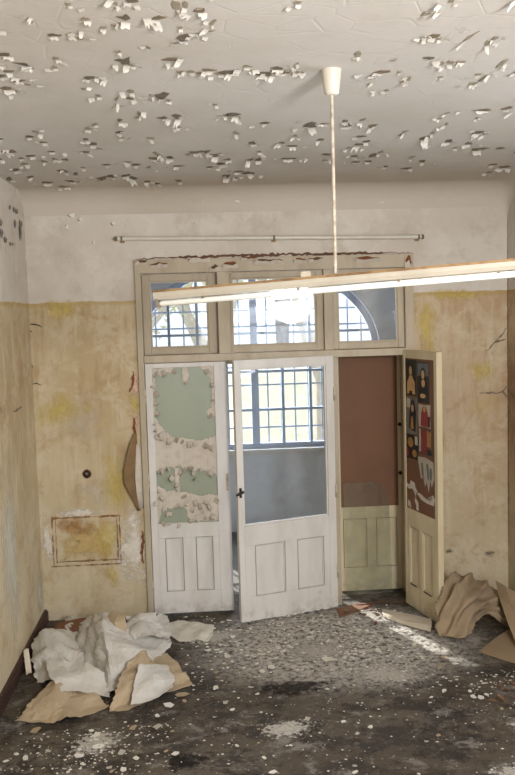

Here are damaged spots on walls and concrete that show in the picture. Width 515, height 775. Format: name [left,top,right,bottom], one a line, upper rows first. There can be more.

peeling [48,0,141,41]
peeling [143,15,167,32]
peeling [172,0,217,46]
peeling [0,53,44,99]
peeling [112,50,142,73]
peeling [162,57,306,83]
peeling [0,130,184,191]
peeling [112,89,189,142]
peeling [185,118,390,183]
peeling [419,103,515,156]
crack [480,282,515,547]
peeling [151,366,219,528]